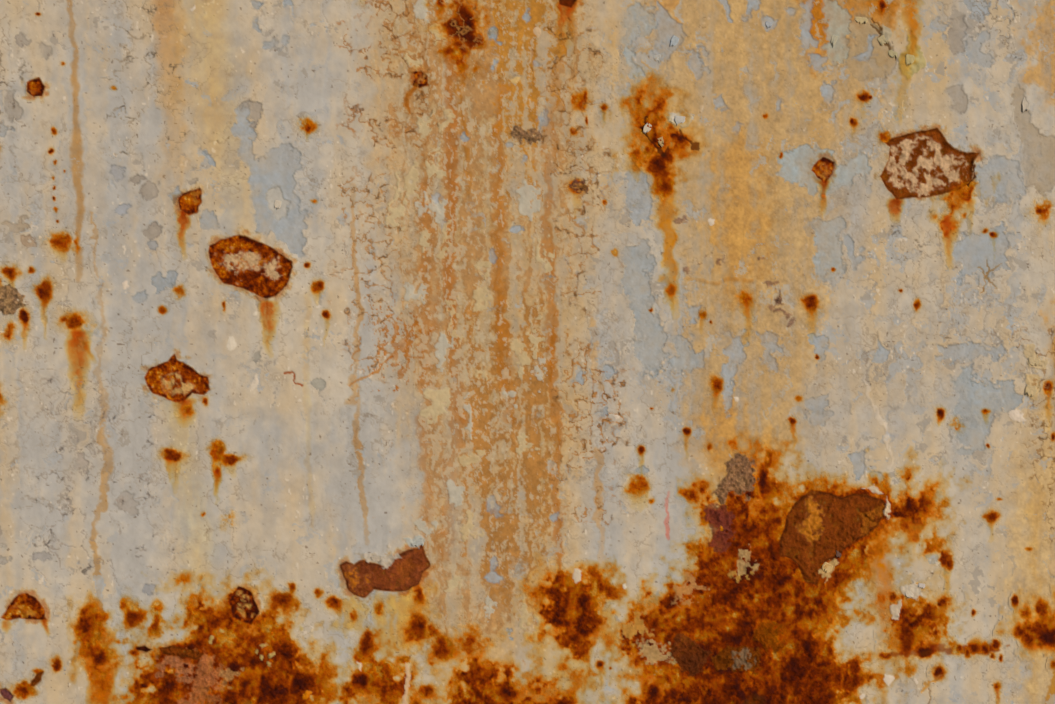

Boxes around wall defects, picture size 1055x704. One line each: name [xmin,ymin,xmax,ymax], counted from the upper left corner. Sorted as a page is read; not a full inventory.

peeling [616,0,711,82]
peeling [716,0,915,109]
peeling [928,0,994,116]
spalling [774,79,1055,287]
rust [0,0,628,704]
rust [542,0,1055,704]
peeling [805,332,830,369]